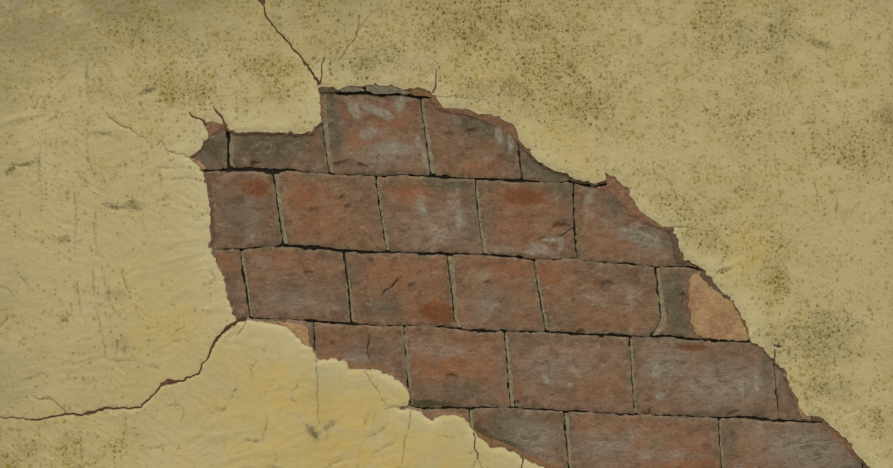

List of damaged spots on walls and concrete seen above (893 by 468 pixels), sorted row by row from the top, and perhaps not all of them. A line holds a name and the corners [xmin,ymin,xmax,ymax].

crack [258,0,325,85]
spalling [189,84,869,468]
crack [0,318,245,421]